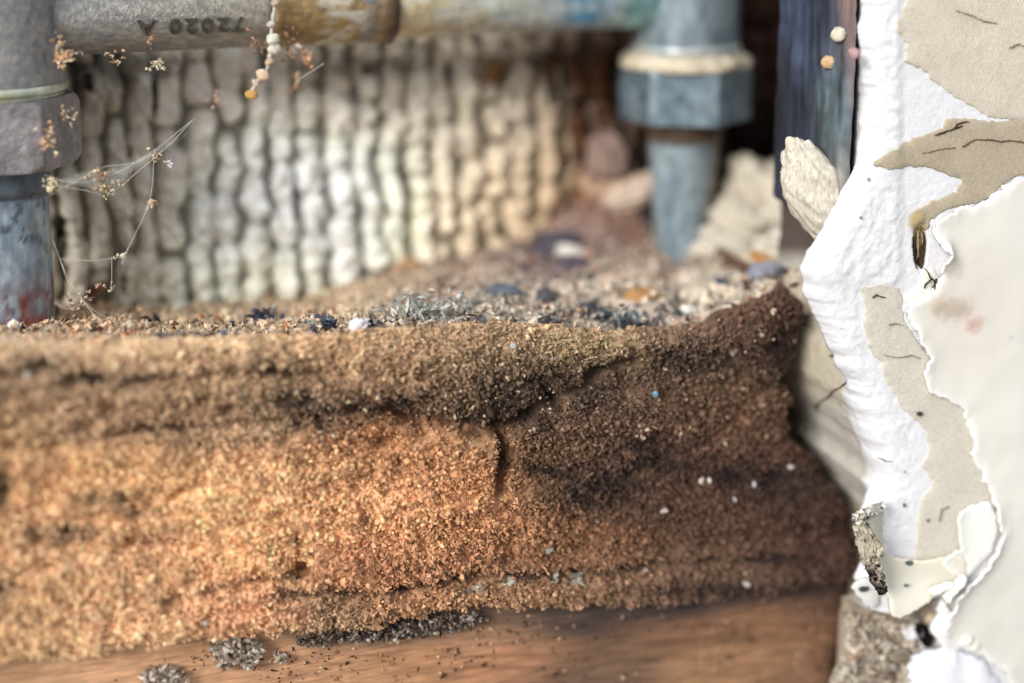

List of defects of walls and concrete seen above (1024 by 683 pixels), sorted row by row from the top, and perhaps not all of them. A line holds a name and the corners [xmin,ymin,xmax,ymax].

peeling [851,0,1024,683]